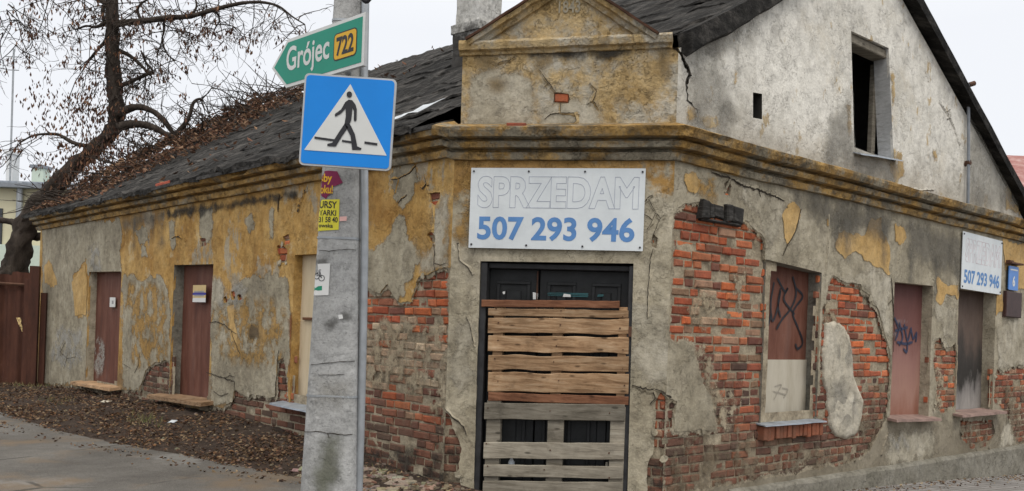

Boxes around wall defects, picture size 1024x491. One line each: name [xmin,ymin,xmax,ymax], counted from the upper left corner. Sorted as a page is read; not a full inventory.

crack [673,47,699,121]
peeling [42,217,176,403]
peeling [199,208,214,246]
peeling [207,207,307,436]
spalling [364,161,478,485]
crack [712,171,801,256]
spalling [631,171,934,491]
spalling [923,276,1024,451]